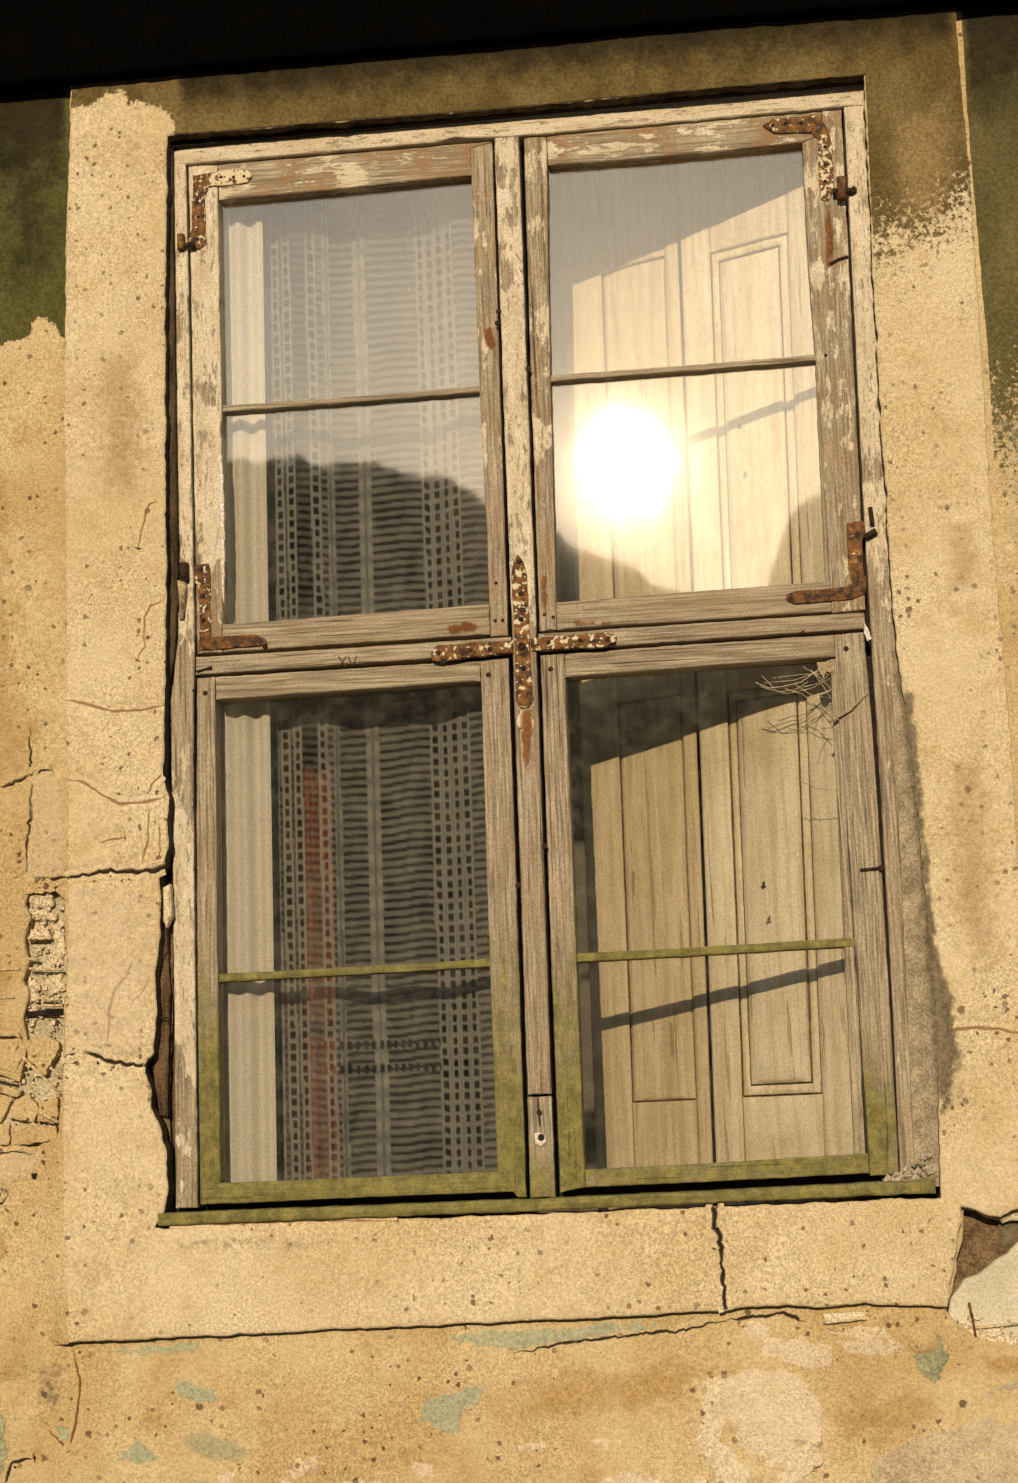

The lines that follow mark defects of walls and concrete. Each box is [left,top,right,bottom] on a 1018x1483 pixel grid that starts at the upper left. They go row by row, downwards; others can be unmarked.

peeling [0,8,1018,505]
corrosion [448,622,476,633]
crack [65,695,165,719]
corrosion [522,710,532,765]
crack [0,725,167,894]
spalling [0,891,67,1147]
crack [950,1020,1018,1040]
crack [513,1202,857,1359]
spalling [946,1209,1018,1346]
spalling [601,1470,665,1483]
spalling [692,1311,948,1483]
spalling [870,1378,1018,1483]